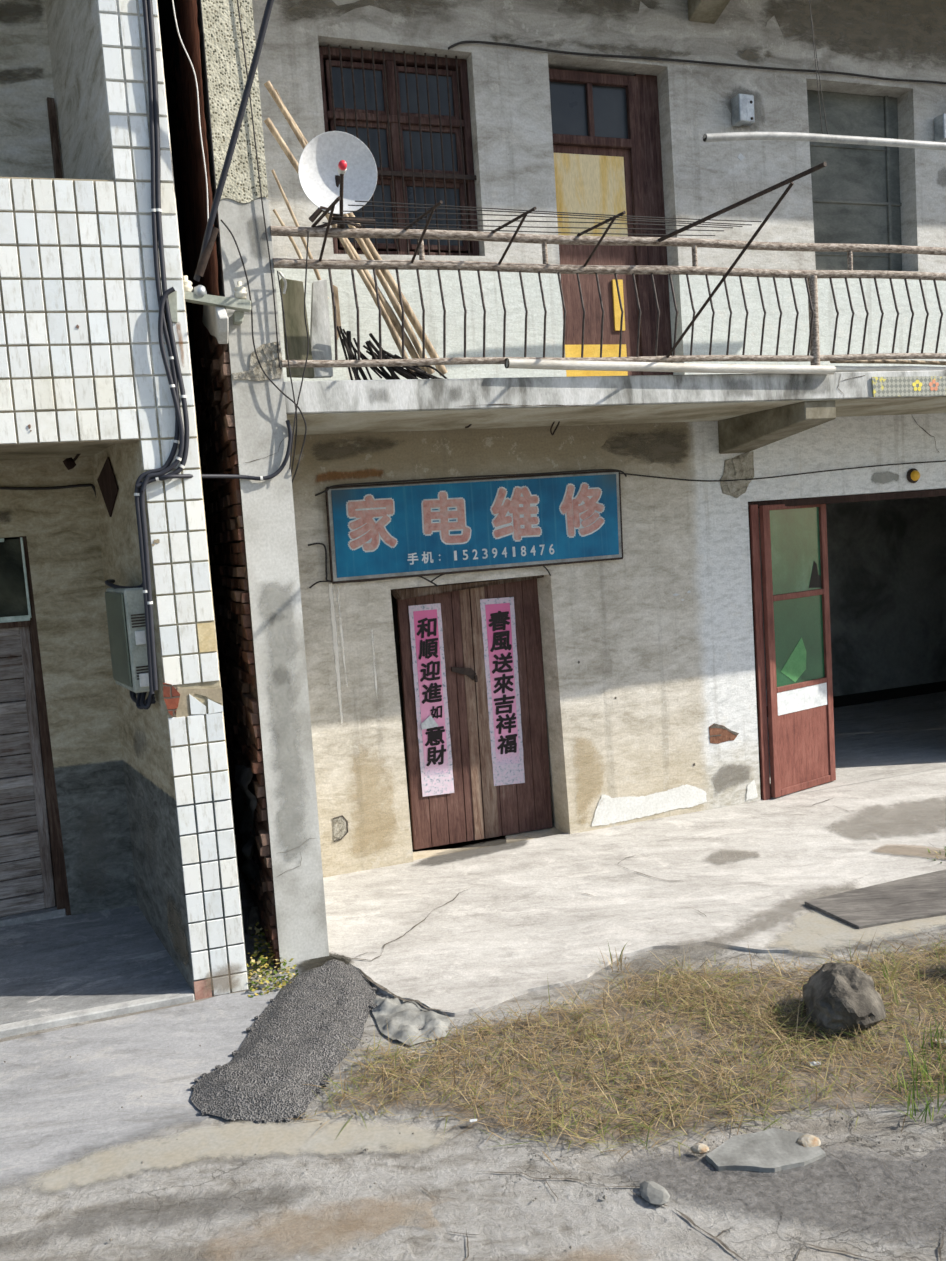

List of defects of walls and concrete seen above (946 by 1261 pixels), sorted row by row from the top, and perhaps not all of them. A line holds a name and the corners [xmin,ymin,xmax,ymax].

leakage [765,0,946,64]
leakage [738,47,772,62]
leakage [0,68,42,83]
flaking render [720,452,754,498]
spalling [163,682,223,718]
flaking render [709,723,739,744]
peeling [592,784,707,827]
crack [786,1234,880,1261]